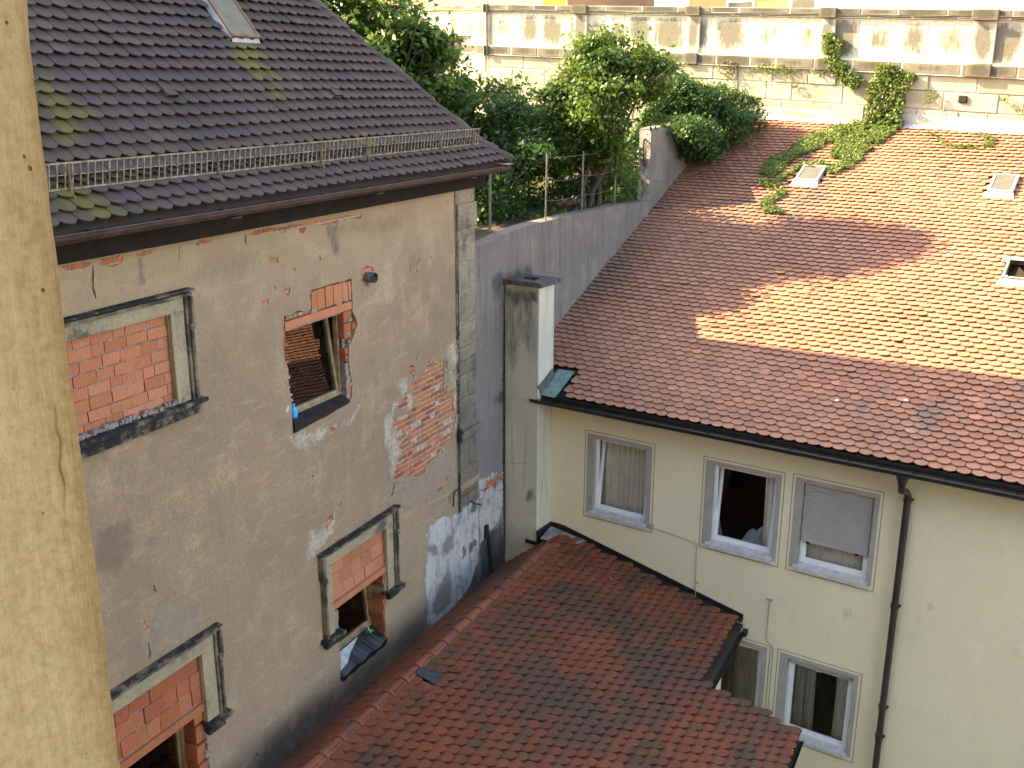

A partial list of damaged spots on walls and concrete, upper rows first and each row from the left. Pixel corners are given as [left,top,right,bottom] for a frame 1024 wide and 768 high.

flaking render [250,214,361,235]
flaking render [61,255,123,270]
flaking render [385,350,456,496]